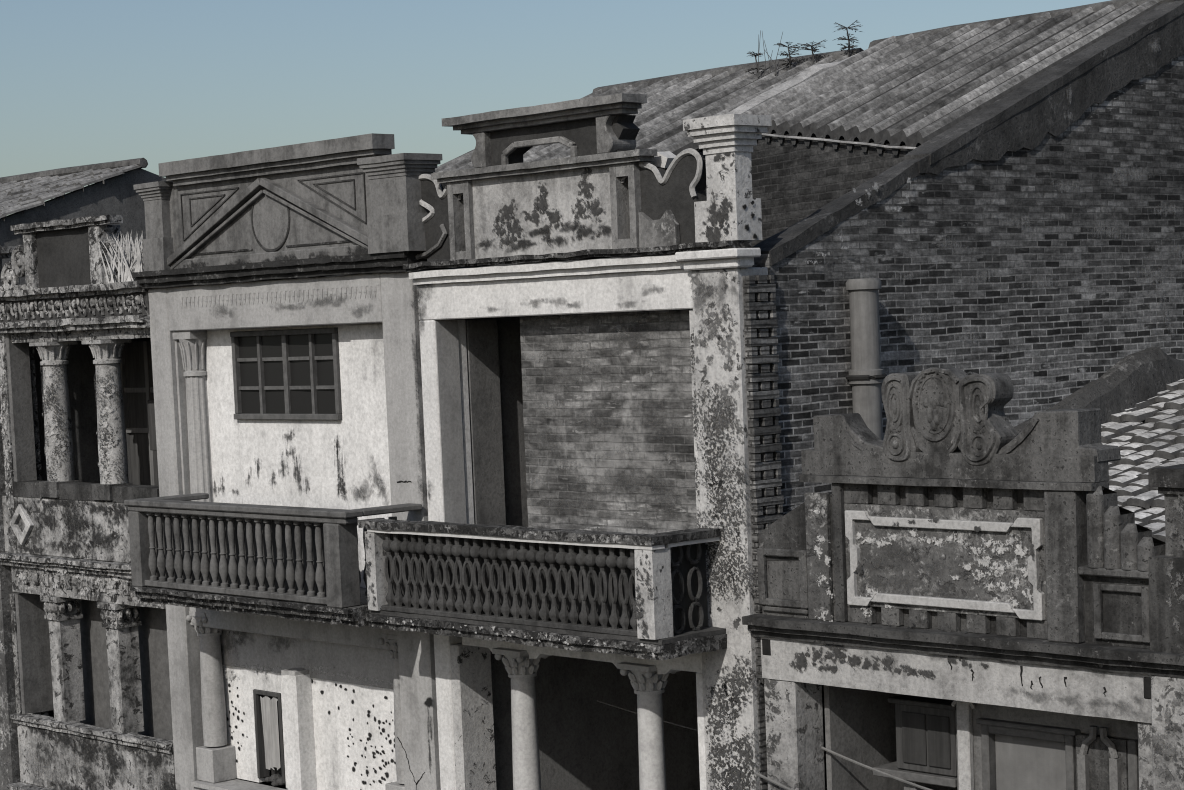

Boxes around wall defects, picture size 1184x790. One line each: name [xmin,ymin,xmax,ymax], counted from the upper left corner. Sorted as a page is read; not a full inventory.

flaking render [492,167,606,249]
flaking render [700,190,757,250]
leakage [272,432,310,491]
leakage [334,439,346,497]
peeling [856,517,1041,607]
peeling [860,588,927,630]
peeling [223,663,281,762]
spalling [306,665,395,790]